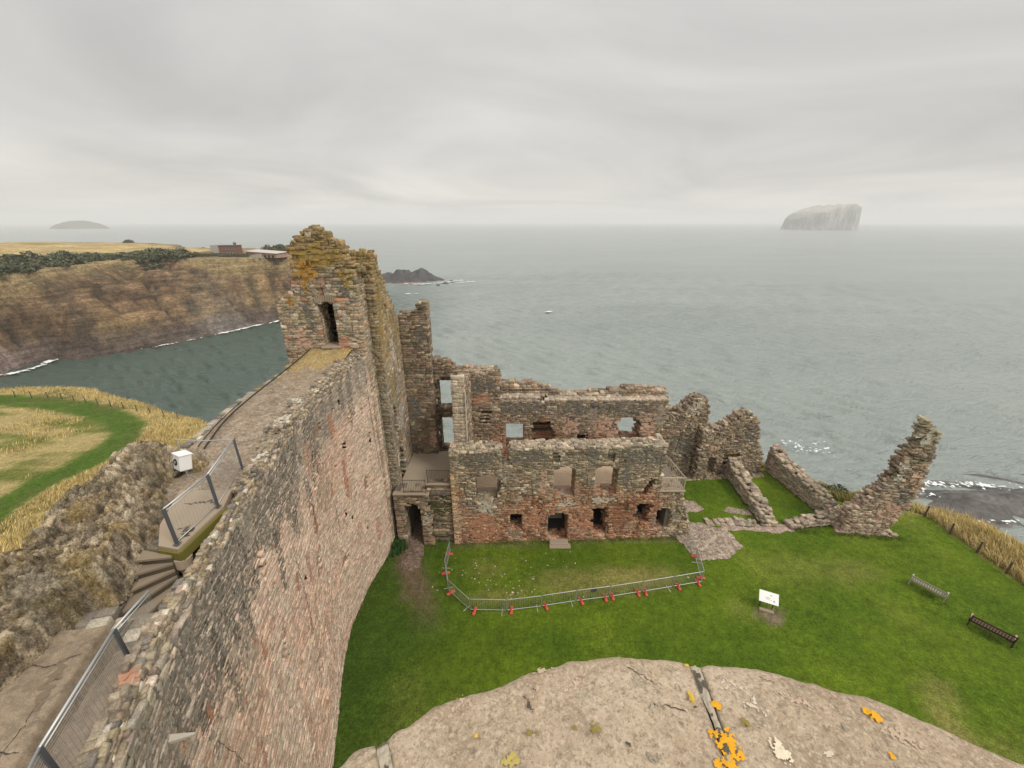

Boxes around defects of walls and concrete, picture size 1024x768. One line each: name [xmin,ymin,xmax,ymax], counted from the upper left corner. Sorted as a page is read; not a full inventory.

crack [0,699,42,756]